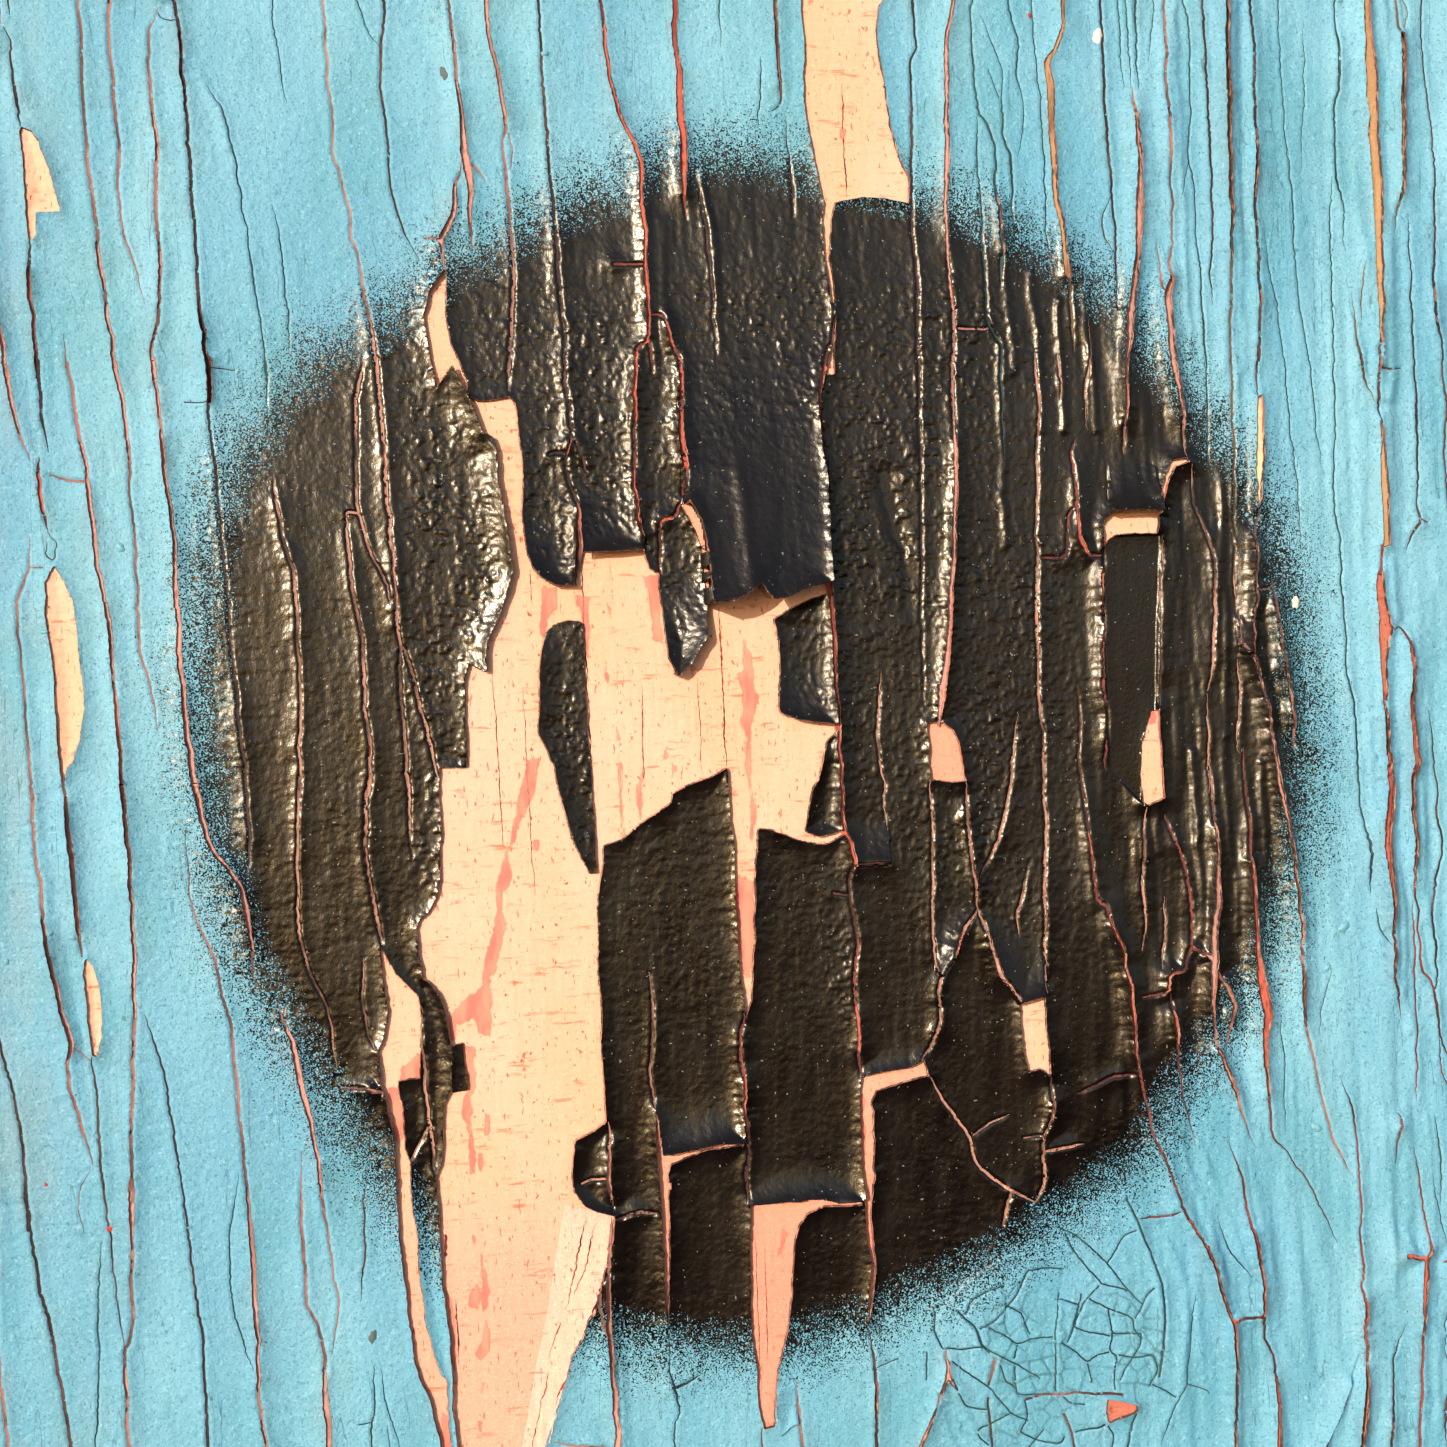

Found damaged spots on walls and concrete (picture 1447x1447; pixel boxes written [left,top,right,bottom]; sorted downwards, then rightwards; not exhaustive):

peeling [19,129,60,239]
crack [599,0,718,574]
crack [757,0,794,218]
peeling [44,567,85,781]
crack [0,0,399,1447]
crack [273,0,587,1094]
peeling [377,0,929,1447]
peeling [1103,443,1188,545]
peeling [1140,710,1163,806]
crack [868,0,1447,1447]
peeling [1376,571,1392,699]
crack [410,1005,436,1177]